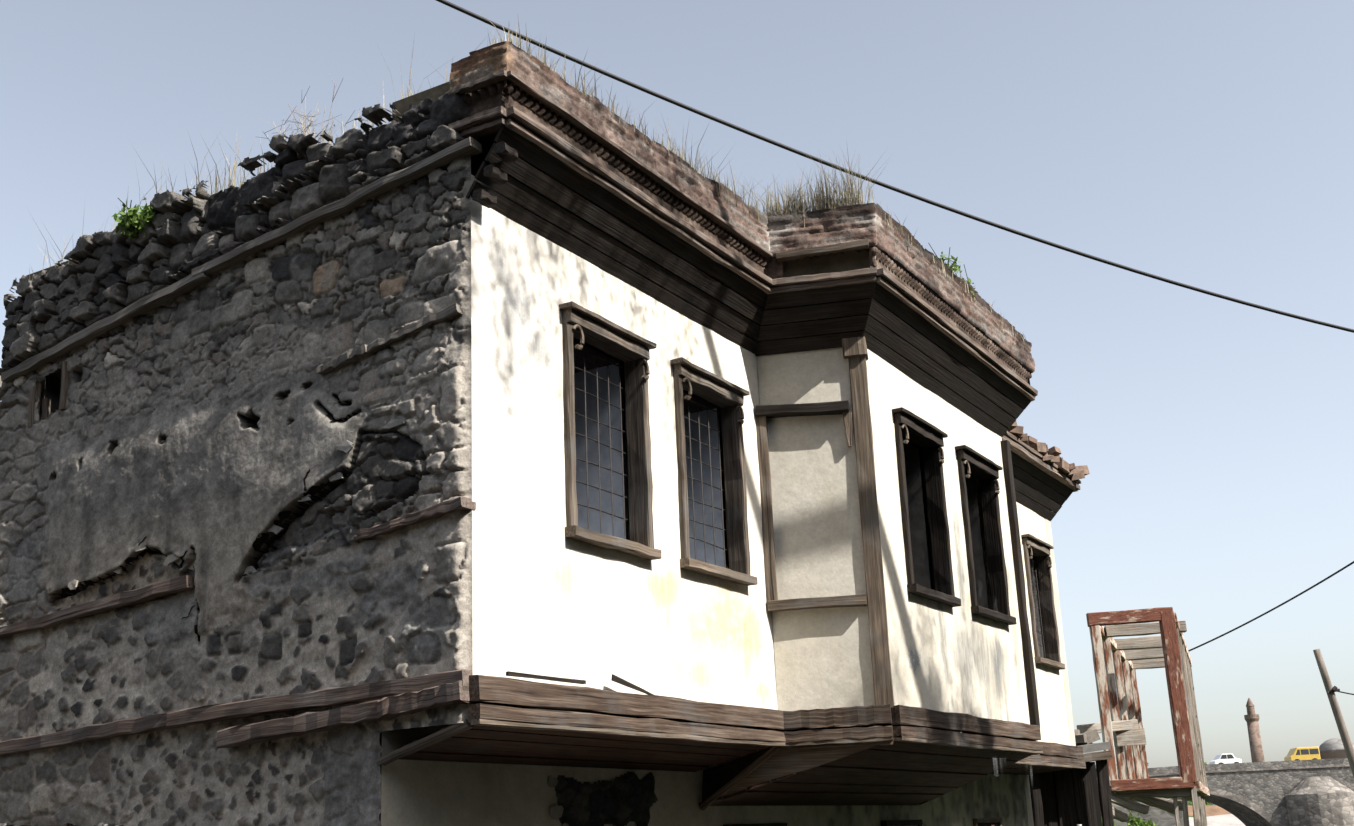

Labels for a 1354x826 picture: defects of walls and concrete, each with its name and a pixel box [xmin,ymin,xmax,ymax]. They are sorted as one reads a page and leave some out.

spalling [274,382,313,400]
flaking render [243,419,431,575]
flaking render [53,543,195,616]
flaking render [547,772,658,826]